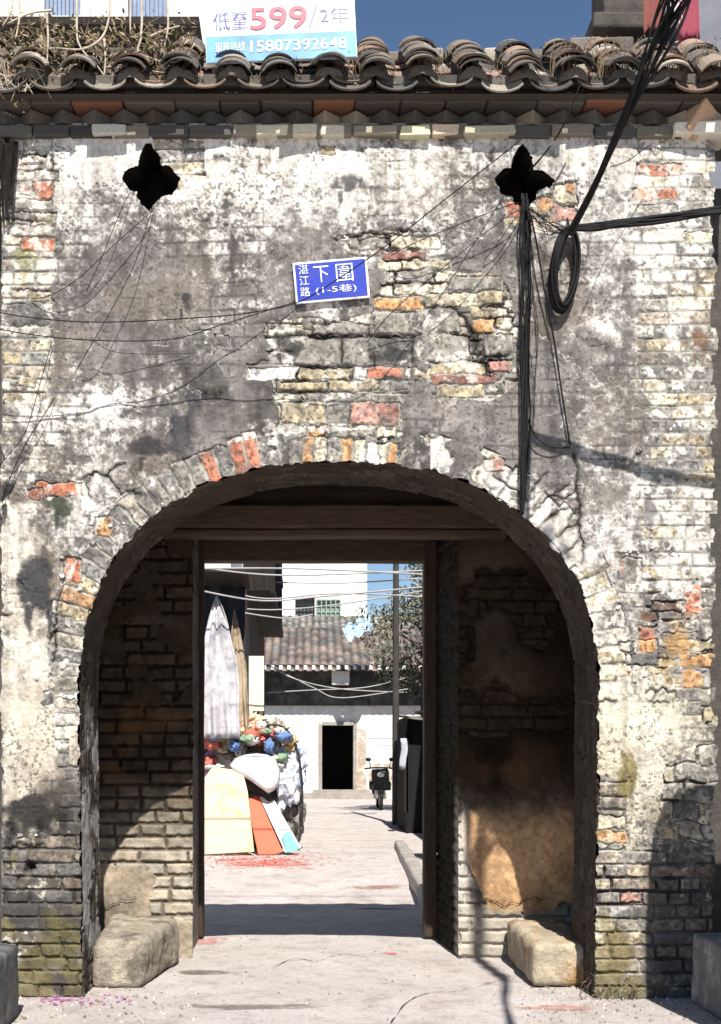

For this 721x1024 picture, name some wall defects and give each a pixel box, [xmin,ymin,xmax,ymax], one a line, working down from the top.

water stain [338,175,357,205]
peeling [2,136,65,343]
water stain [274,333,304,362]
spalling [243,228,524,432]
peeling [613,139,718,730]
spalling [27,476,84,523]
crack [81,464,140,497]
crack [494,454,584,559]
water stain [16,557,53,634]
water stain [617,750,637,797]